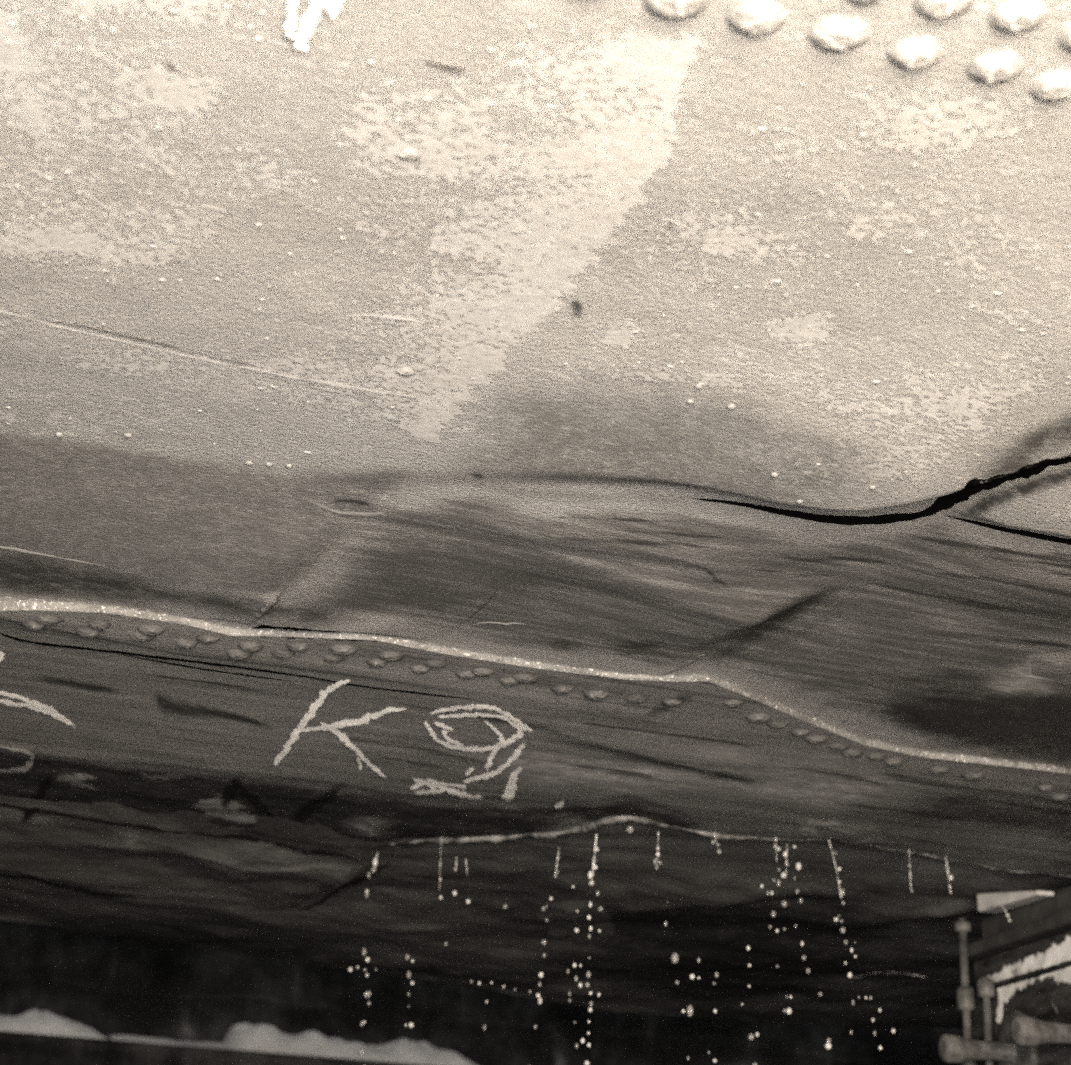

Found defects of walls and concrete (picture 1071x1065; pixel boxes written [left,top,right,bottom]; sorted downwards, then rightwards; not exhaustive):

crack [692,456,1071,545]
water stain [596,903,893,995]
water stain [346,995,399,1026]
water stain [527,1021,604,1065]
water stain [619,1024,786,1065]